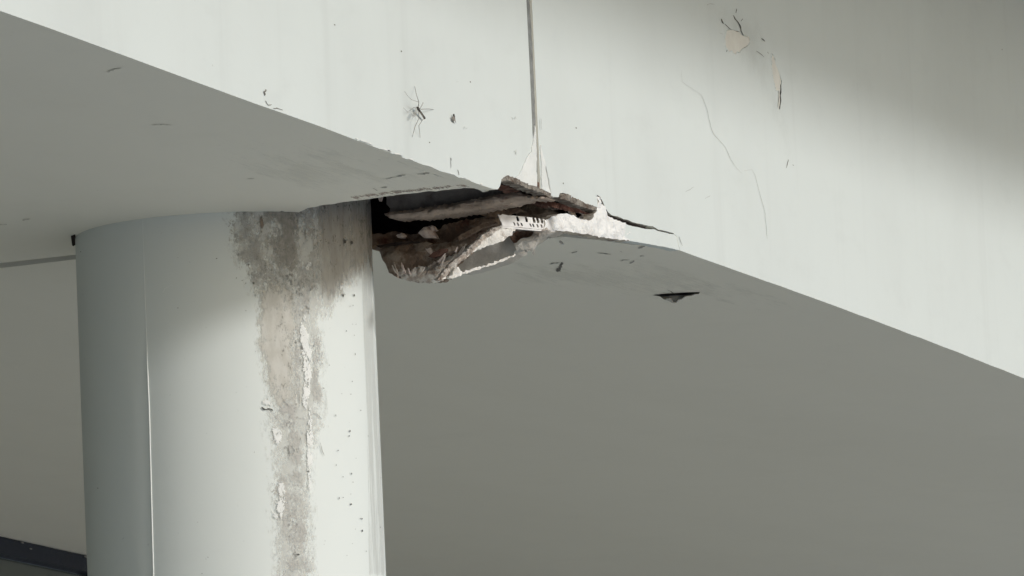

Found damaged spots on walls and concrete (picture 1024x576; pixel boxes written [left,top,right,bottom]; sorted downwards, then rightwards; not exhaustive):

spalling [370,173,680,284]
crack [551,195,682,272]
peeling [654,290,700,303]
damp [230,199,373,576]